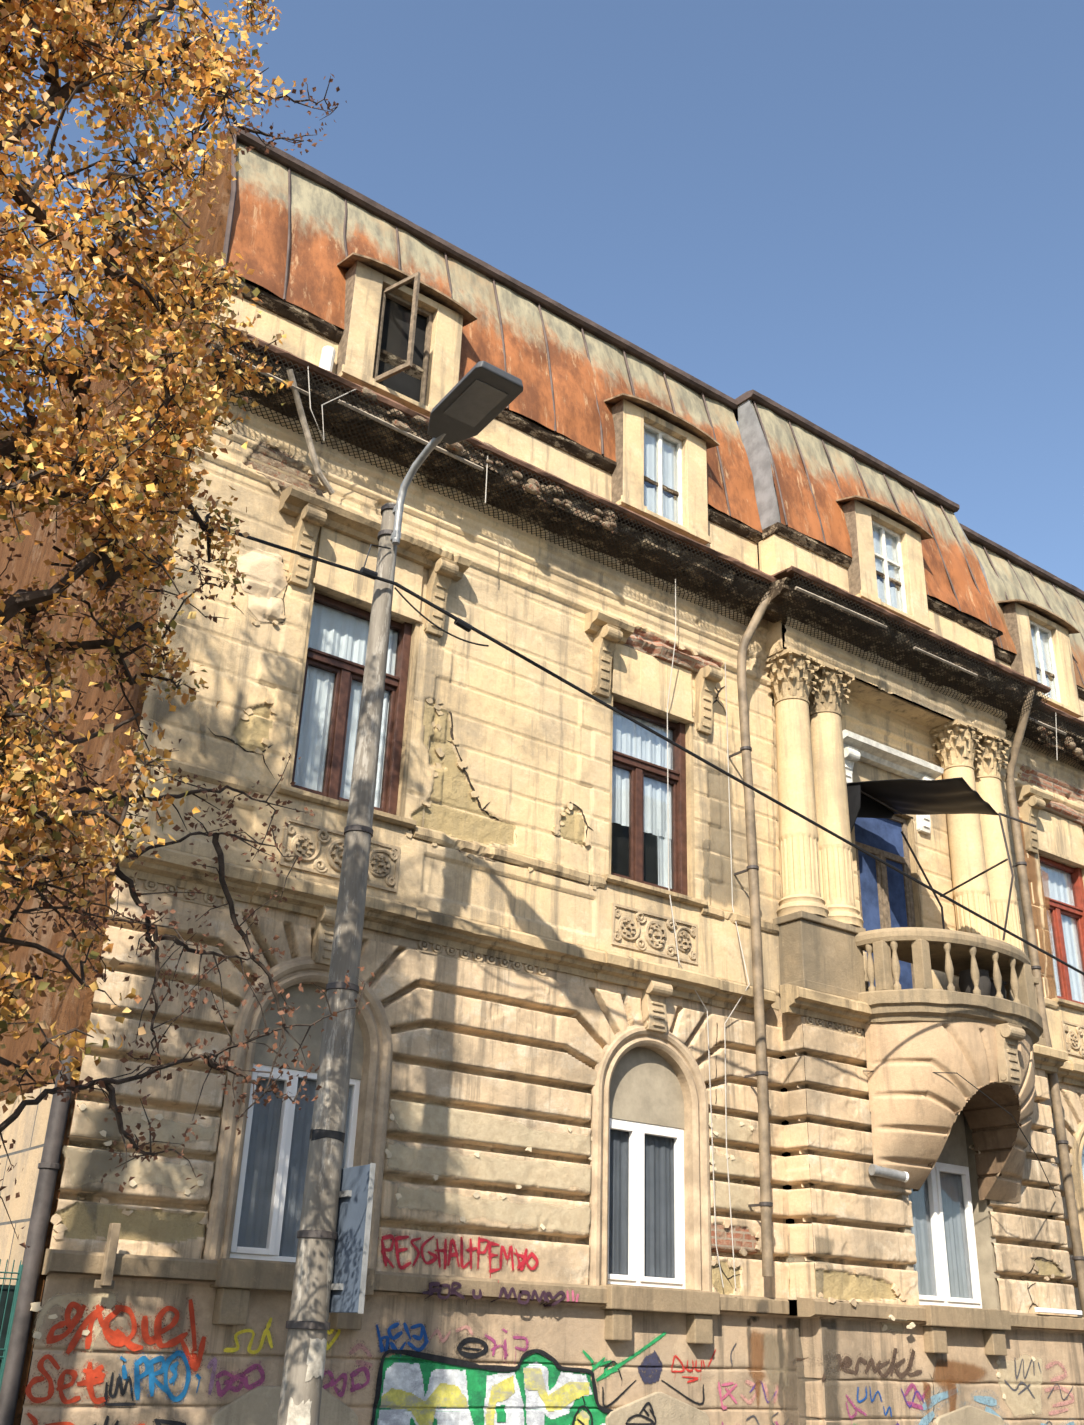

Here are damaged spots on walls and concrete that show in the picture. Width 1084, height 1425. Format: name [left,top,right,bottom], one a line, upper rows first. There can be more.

spalling [230,698,277,754]
spalling [406,698,533,872]
spalling [551,803,591,847]
peeling [708,1117,762,1295]
spalling [815,1269,916,1331]